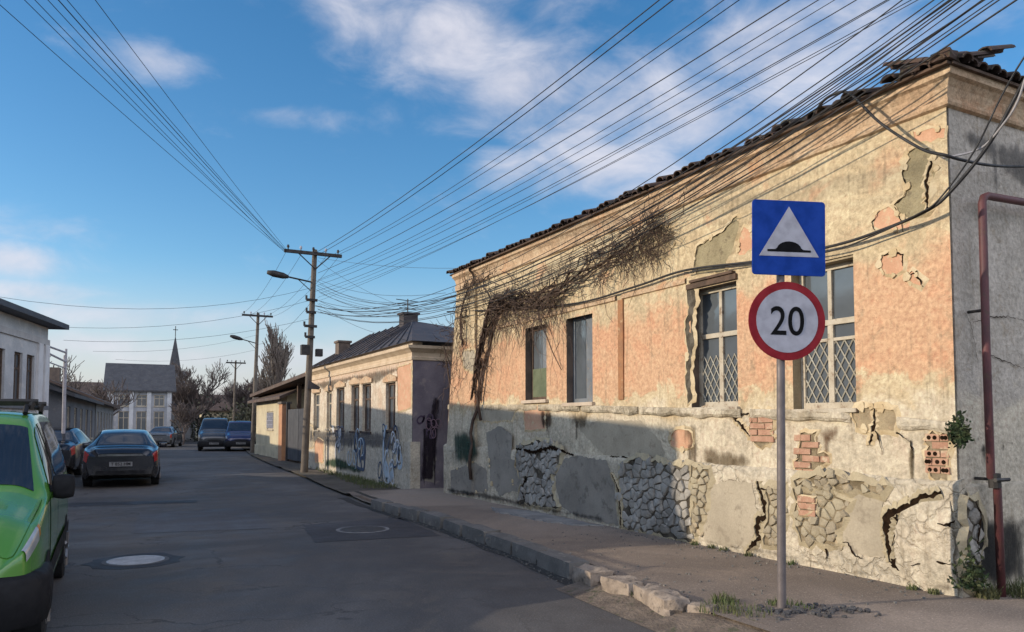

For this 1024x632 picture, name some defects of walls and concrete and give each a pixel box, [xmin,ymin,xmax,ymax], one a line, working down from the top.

peeling [872,125,948,235]
peeling [692,212,752,277]
peeling [875,247,930,292]
flaking render [450,402,561,507]
flaking render [615,425,710,539]
crack [744,481,767,554]
flaking render [748,405,777,450]
flaking render [762,428,850,551]
crack [866,408,913,459]
crack [825,485,982,571]
flaking render [921,430,955,481]